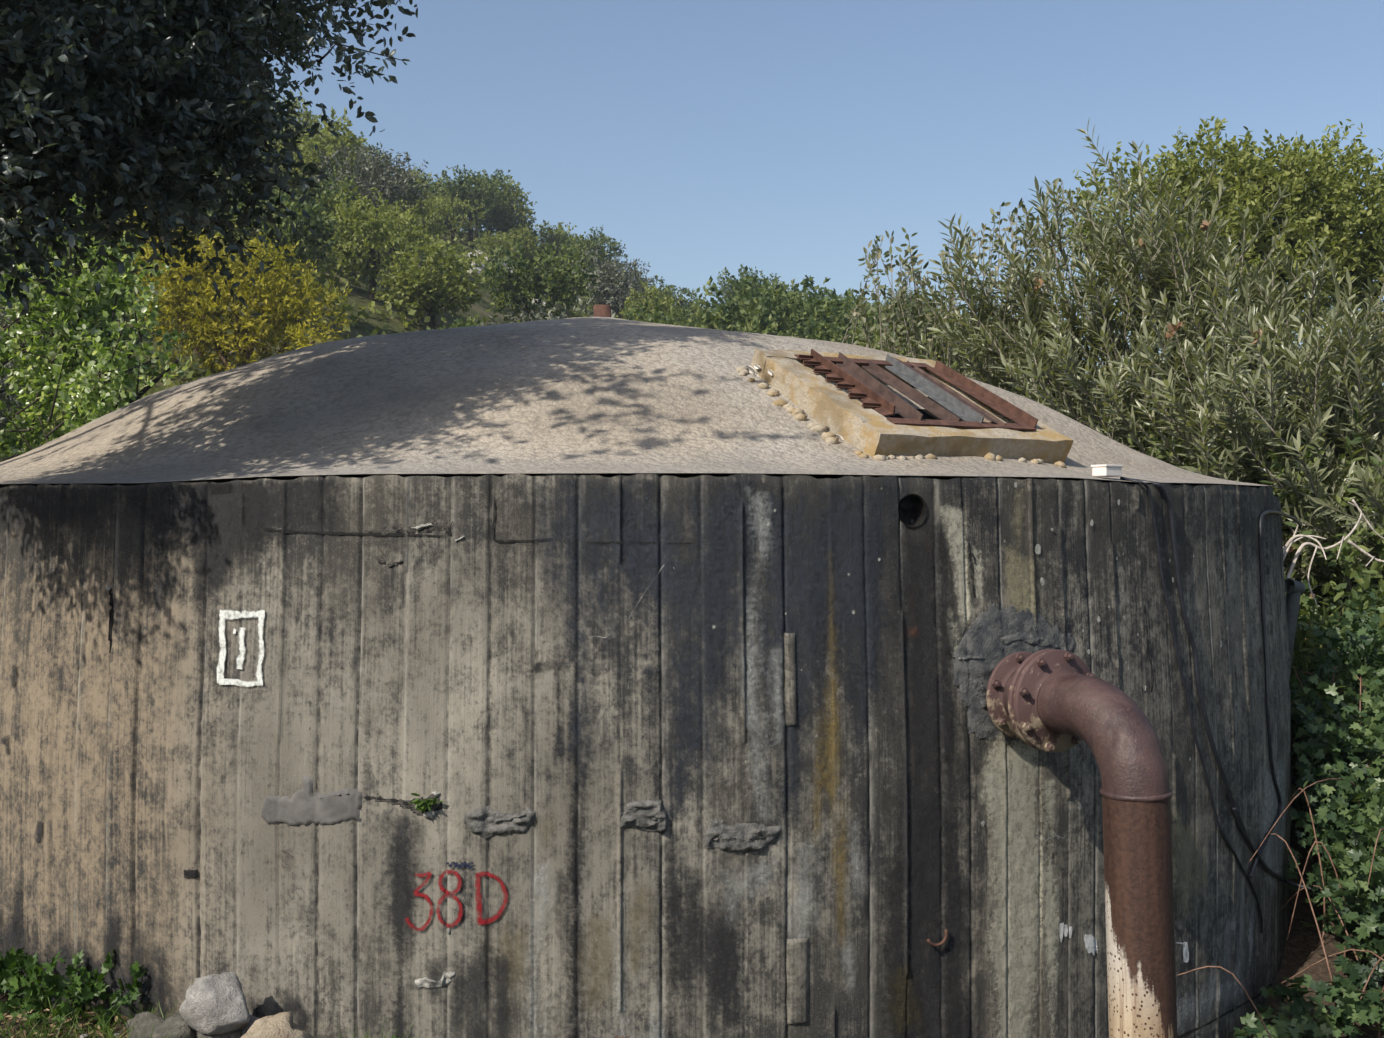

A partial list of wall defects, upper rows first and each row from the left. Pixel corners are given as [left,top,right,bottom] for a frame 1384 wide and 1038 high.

water stain [535,479,984,1038]
water stain [979,735,1097,1038]